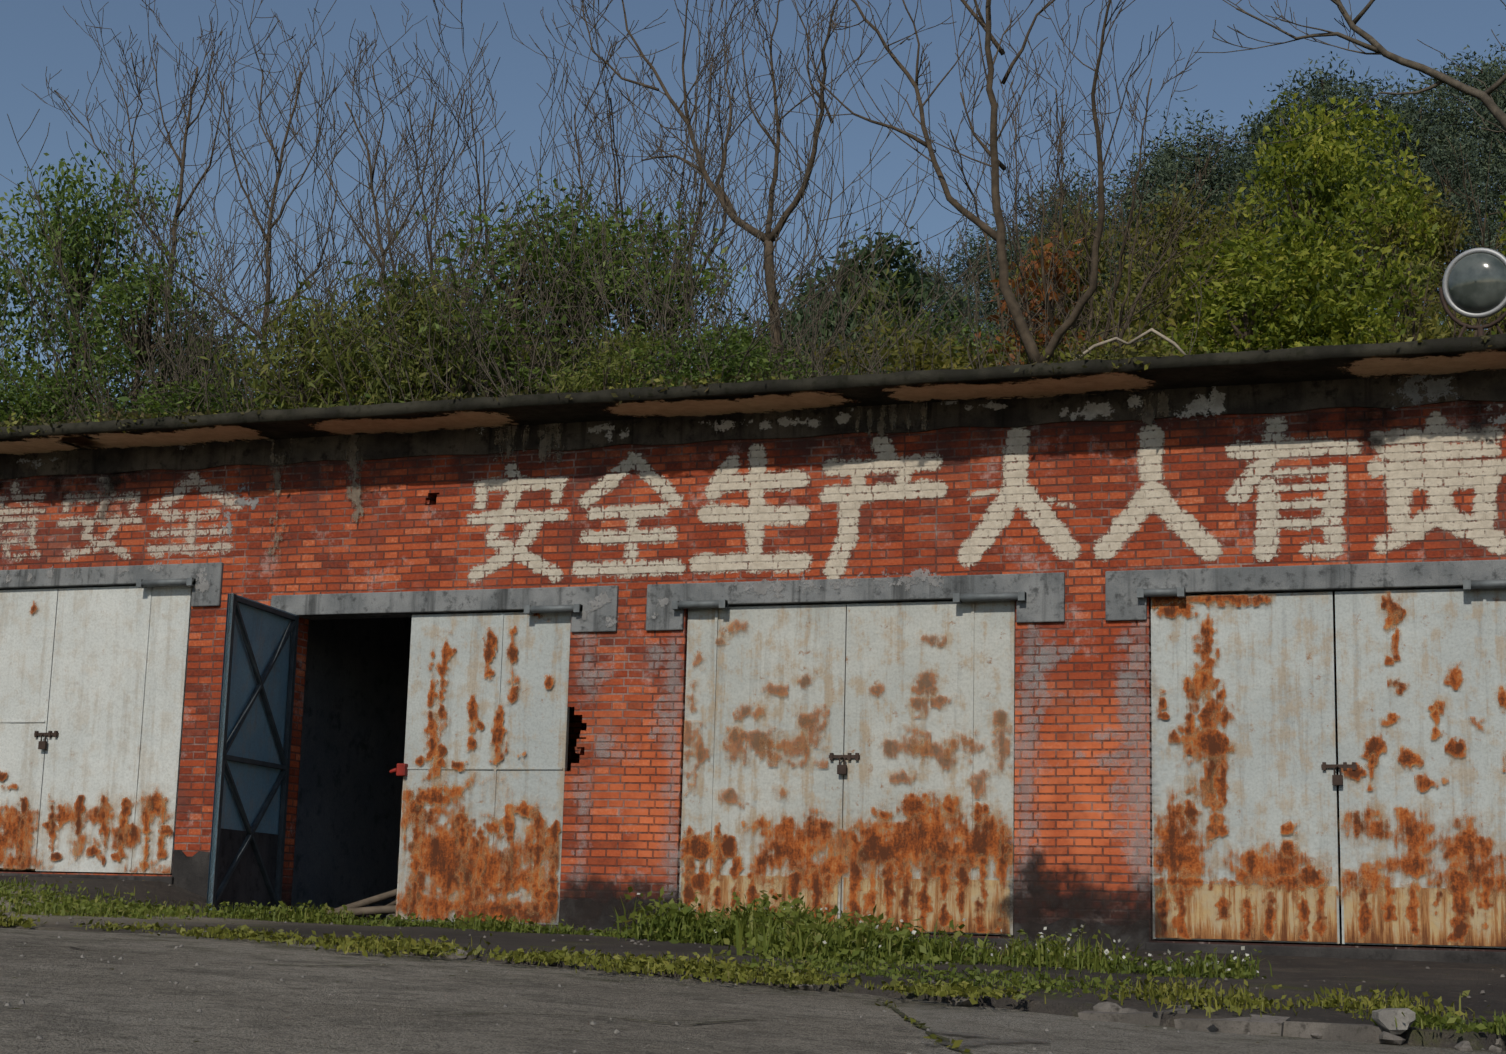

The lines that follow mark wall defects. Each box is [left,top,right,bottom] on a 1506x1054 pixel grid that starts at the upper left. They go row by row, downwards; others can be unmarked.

corrosion [715,619,748,645]
corrosion [921,635,947,647]
corrosion [0,771,173,874]
corrosion [396,625,561,923]
spalling [575,730,586,755]
corrosion [679,653,1013,934]
corrosion [1151,592,1506,945]
leakage [1005,853,1163,940]
crack [877,998,973,1054]